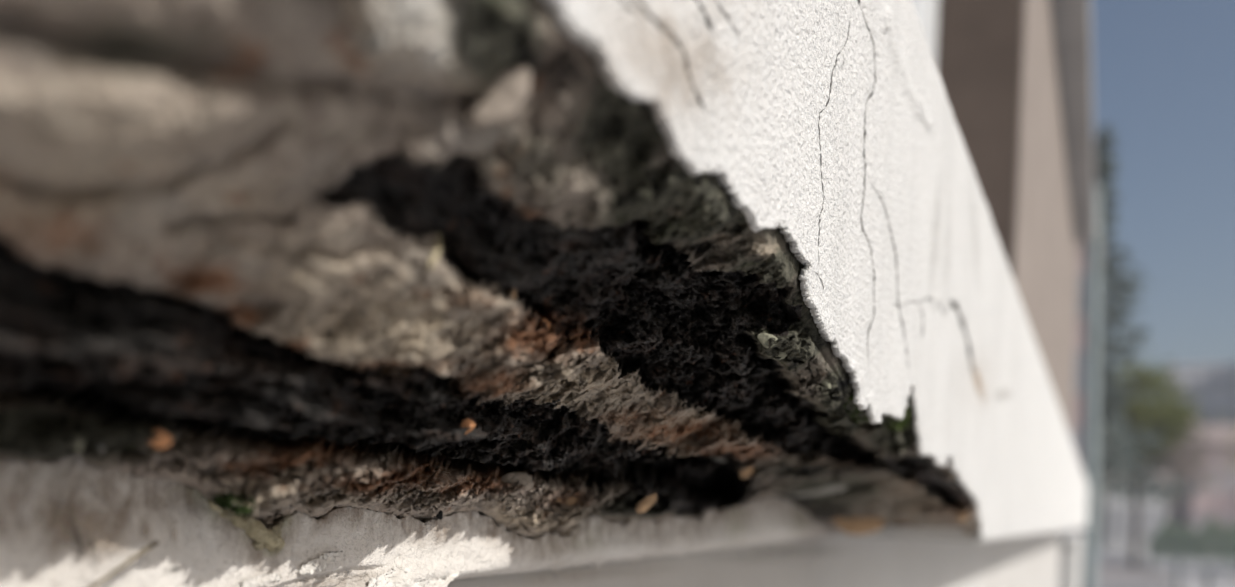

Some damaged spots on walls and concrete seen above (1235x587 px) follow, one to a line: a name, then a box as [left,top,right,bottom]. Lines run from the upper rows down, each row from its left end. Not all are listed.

crack [696,0,738,35]
crack [623,0,703,106]
crack [816,0,974,373]
spalling [0,0,980,539]
damp [207,499,285,552]
peeling [241,573,282,587]
peeling [299,551,343,577]
peeling [368,566,459,587]